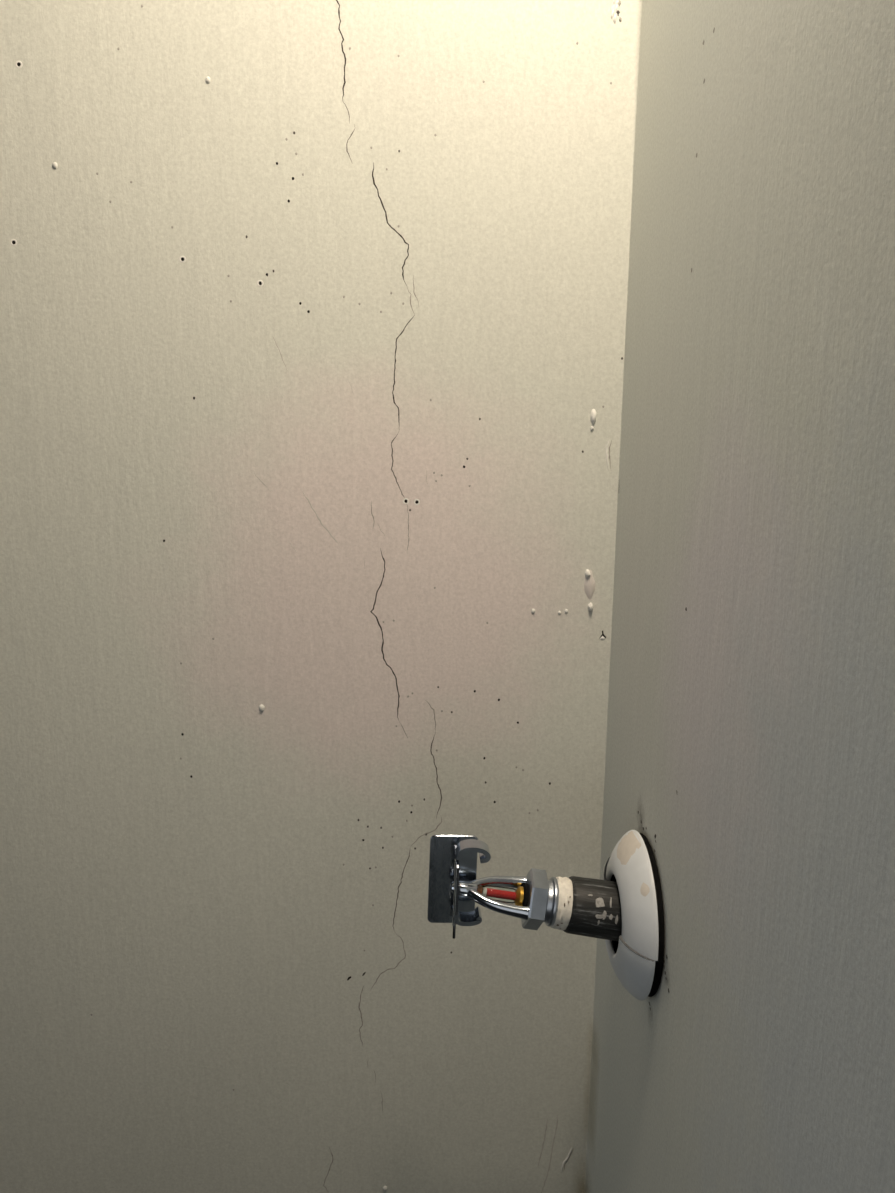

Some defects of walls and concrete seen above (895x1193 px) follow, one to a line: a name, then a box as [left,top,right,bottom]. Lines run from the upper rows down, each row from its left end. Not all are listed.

crack [336,0,442,1111]